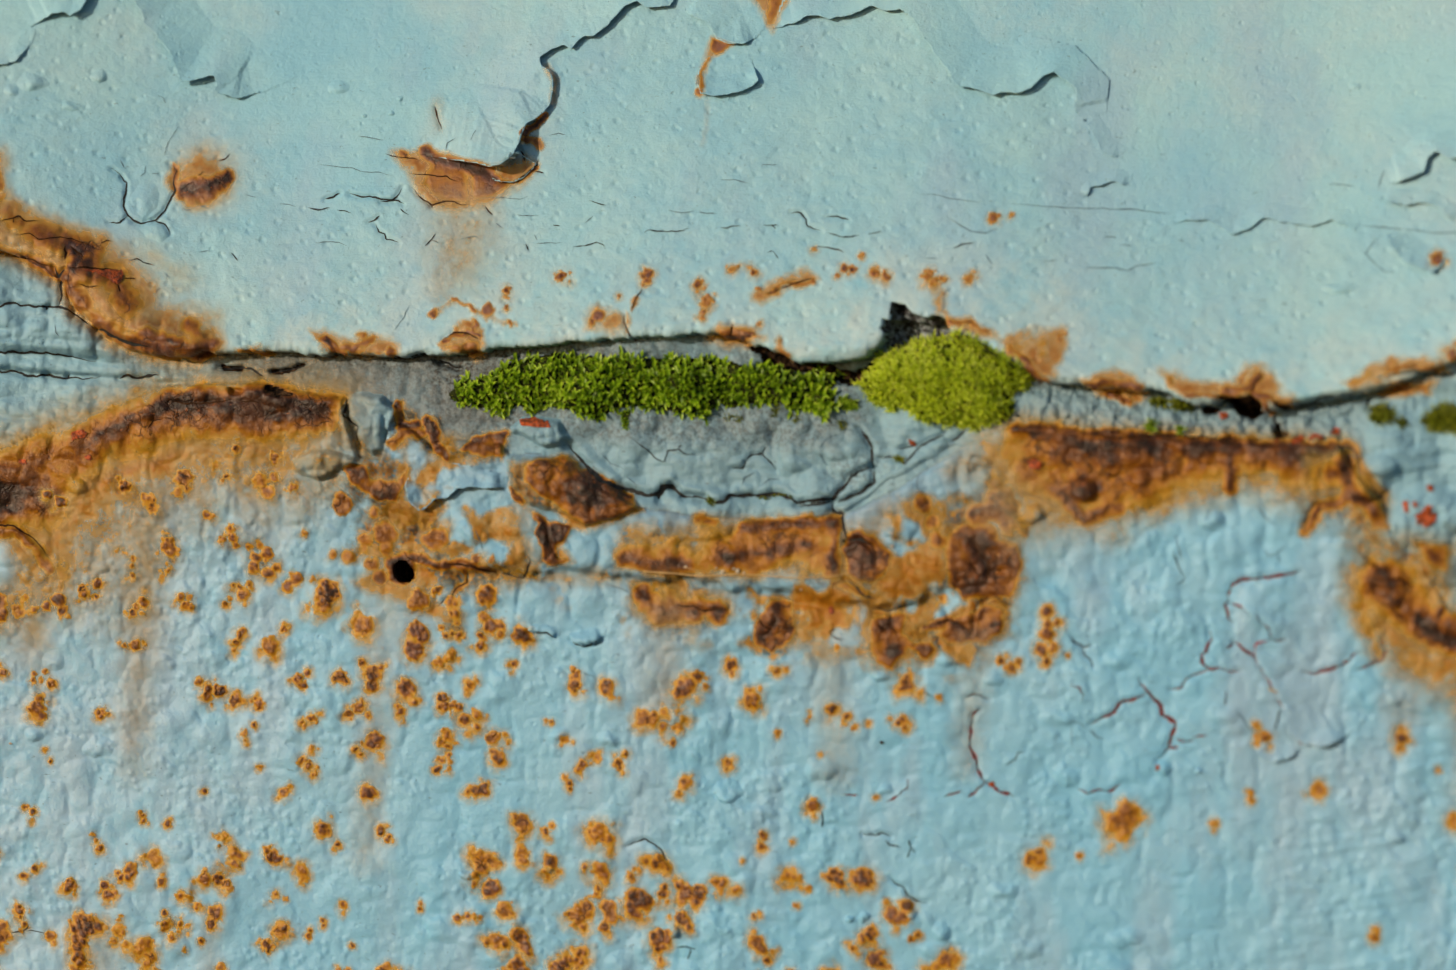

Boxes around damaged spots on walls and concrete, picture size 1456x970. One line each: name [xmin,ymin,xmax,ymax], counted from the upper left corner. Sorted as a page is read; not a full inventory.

peeling [133,0,296,98]
peeling [409,0,1109,182]
rust [394,112,549,267]
crack [386,310,480,368]
spalling [881,302,953,353]
crack [1086,369,1456,441]
peeling [405,460,507,510]
rust [0,150,1456,805]
crack [1069,494,1384,758]
crack [1306,552,1413,675]
rust [0,831,311,970]
rust [452,813,743,970]